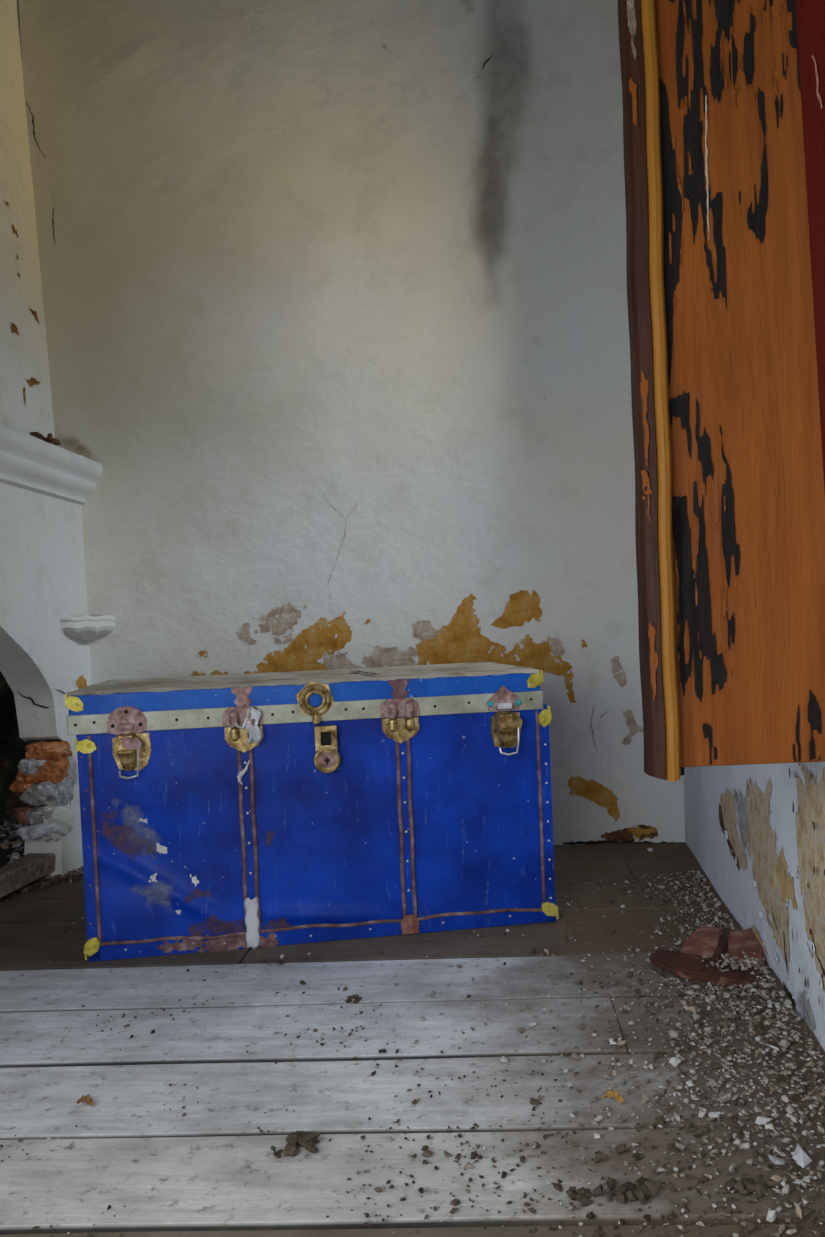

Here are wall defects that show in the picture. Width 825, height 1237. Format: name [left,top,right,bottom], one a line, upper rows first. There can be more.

peeling [190,646,228,676]
peeling [237,588,587,707]
peeling [565,774,662,852]
spalling [649,689,825,1032]
peeling [792,1143,812,1168]